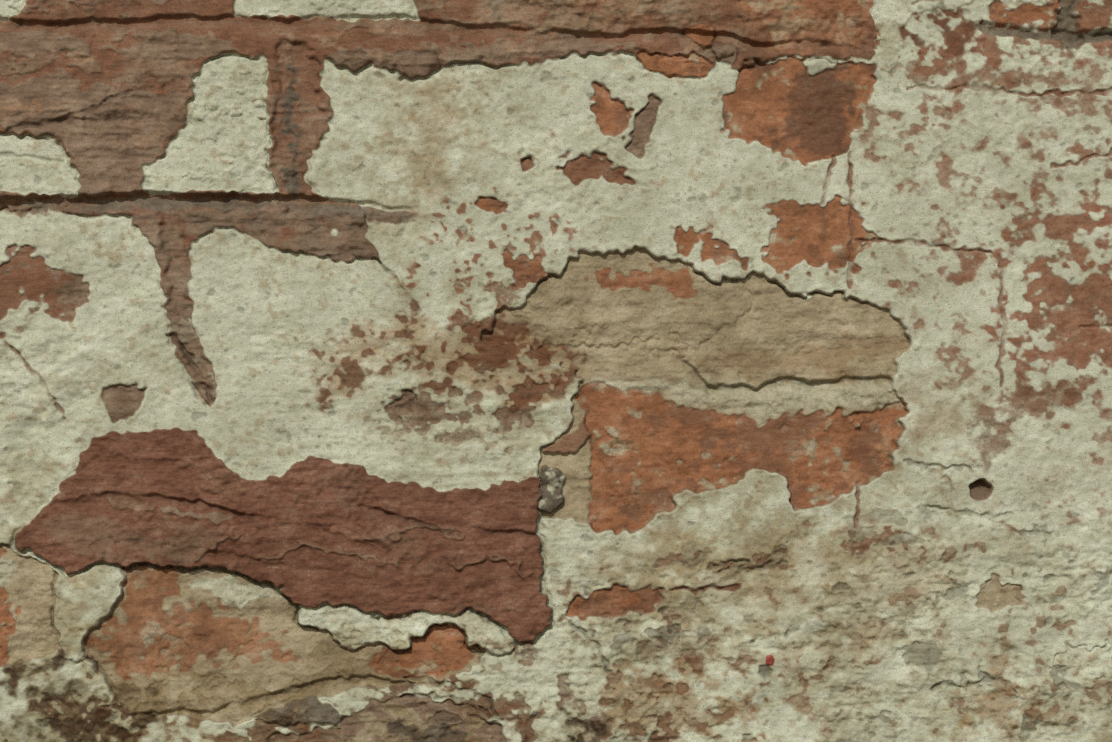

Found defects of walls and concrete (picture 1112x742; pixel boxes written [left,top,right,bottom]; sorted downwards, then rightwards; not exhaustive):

peeling [0,0,26,22]
peeling [234,0,419,22]
spalling [989,0,1060,30]
spalling [637,51,712,78]
spalling [721,56,878,166]
spalling [0,245,90,335]
spalling [481,195,910,533]
peeling [107,496,234,525]
crack [902,457,1054,544]